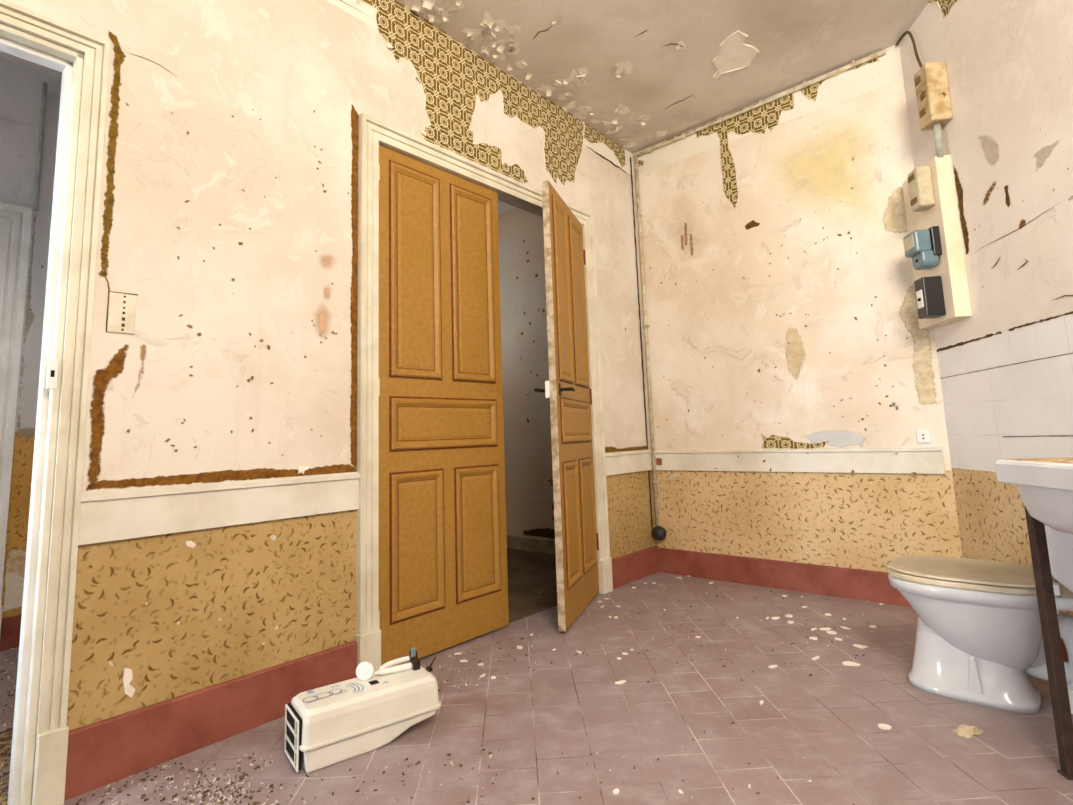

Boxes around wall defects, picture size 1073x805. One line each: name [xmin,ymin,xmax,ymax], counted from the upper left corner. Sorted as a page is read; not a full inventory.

peeling [404,0,465,24]
peeling [461,11,667,148]
flaking render [953,166,980,254]
crack [972,202,1061,254]
flaking render [757,314,809,378]
crack [940,353,1072,379]
crack [1002,432,1073,440]
flaking render [3,548,26,612]